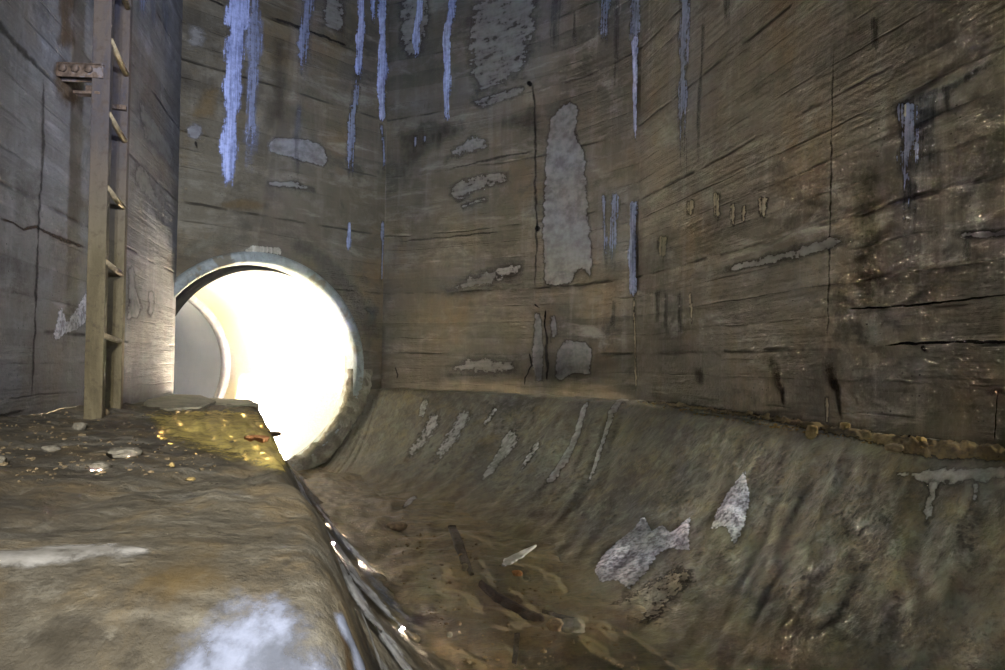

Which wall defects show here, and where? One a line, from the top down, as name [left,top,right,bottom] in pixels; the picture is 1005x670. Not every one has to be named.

damp [219,0,263,183]
damp [347,0,389,169]
damp [408,0,457,160]
crack [401,232,494,242]
crack [453,81,549,385]
peeling [542,102,593,286]
damp [600,0,640,138]
damp [897,70,977,204]
spalling [54,291,87,340]
spalling [595,517,691,590]
spalling [711,472,750,544]
damp [176,602,327,670]